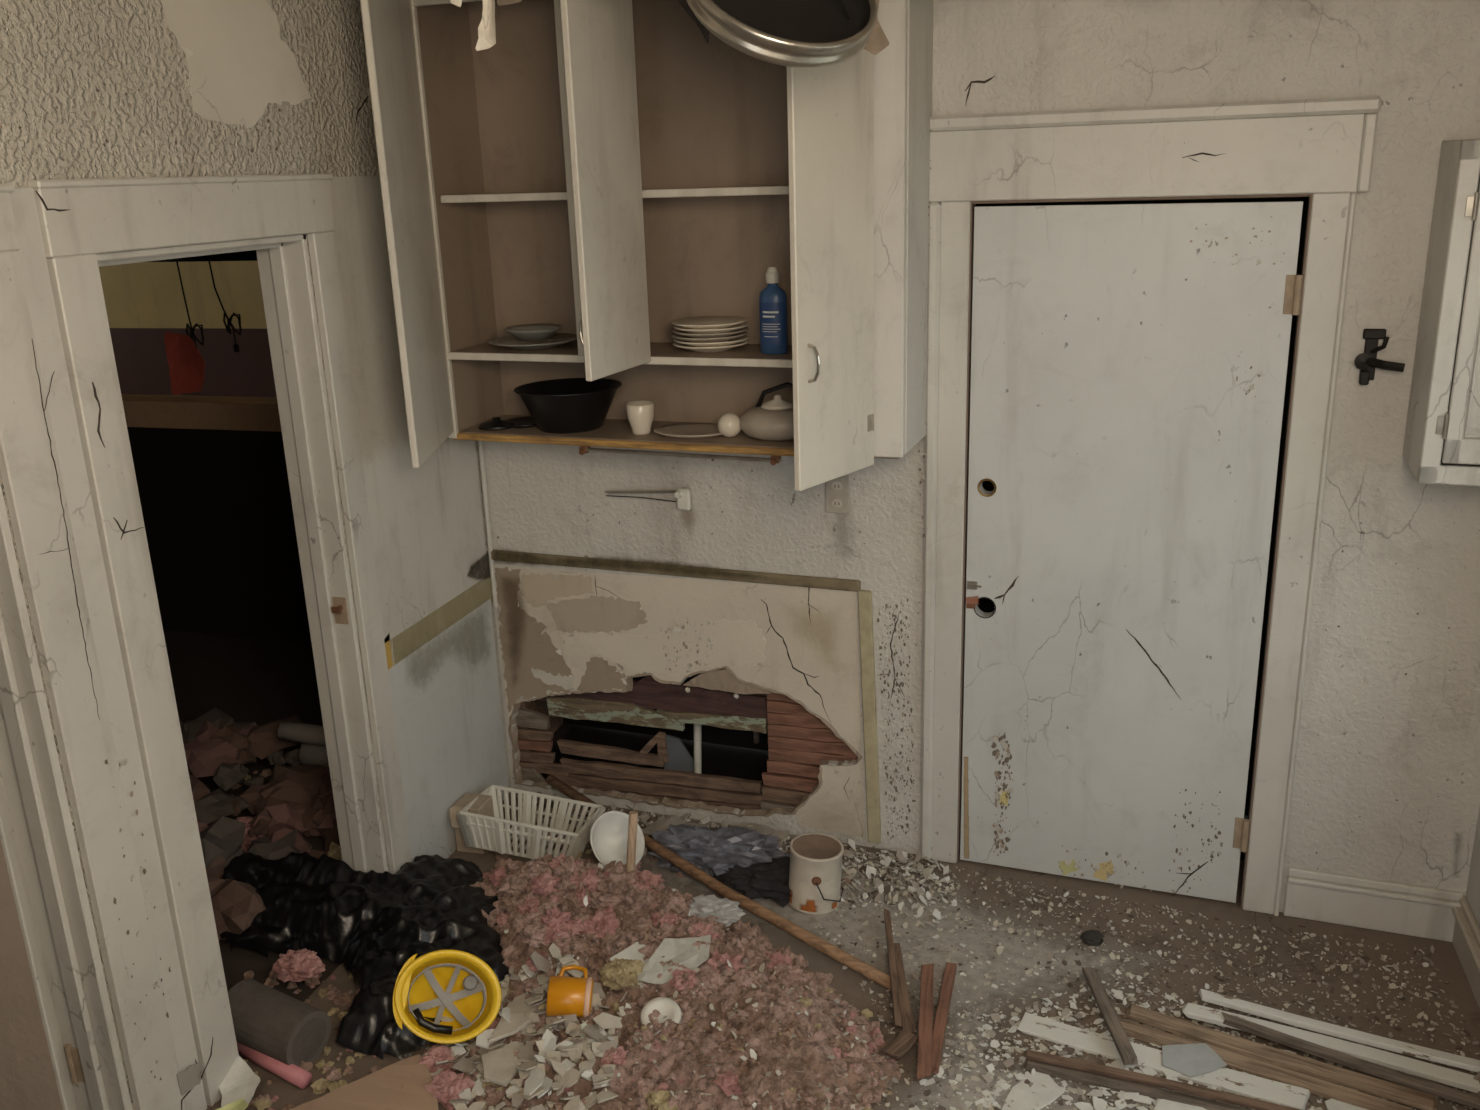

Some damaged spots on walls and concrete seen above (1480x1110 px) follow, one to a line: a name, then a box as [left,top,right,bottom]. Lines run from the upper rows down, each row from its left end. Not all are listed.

peeling [475,0,522,51]
peeling [677,0,710,43]
peeling [863,0,889,55]
peeling [161,0,310,164]
crack [994,577,1018,605]
crack [761,587,831,723]
crack [1126,629,1180,698]
flaking render [490,566,864,837]
peeling [877,599,920,839]
crack [1173,862,1208,896]